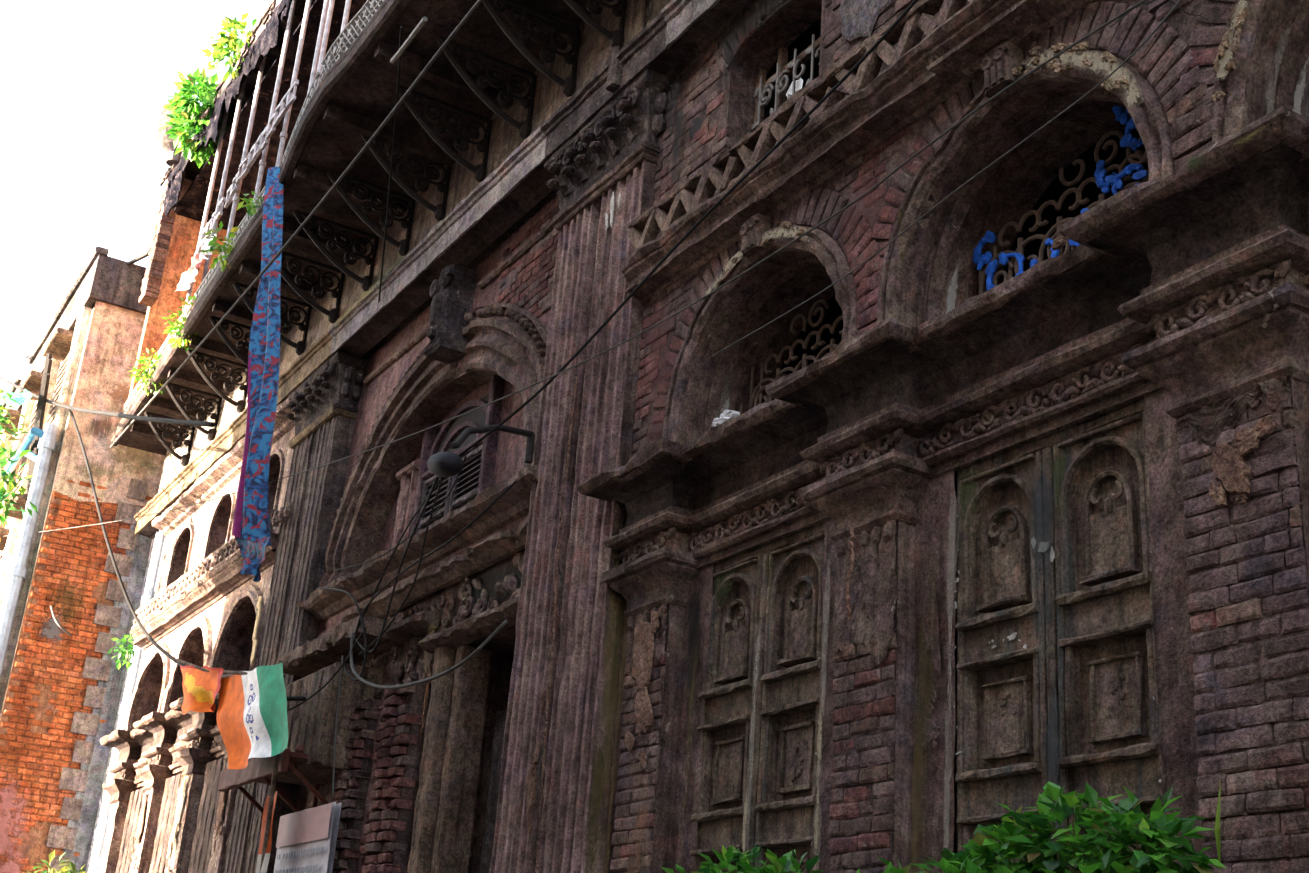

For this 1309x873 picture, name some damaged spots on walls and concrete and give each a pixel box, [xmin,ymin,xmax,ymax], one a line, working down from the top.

peeling [1012,42,1141,107]
spalling [1209,415,1276,507]
peeling [624,610,659,769]